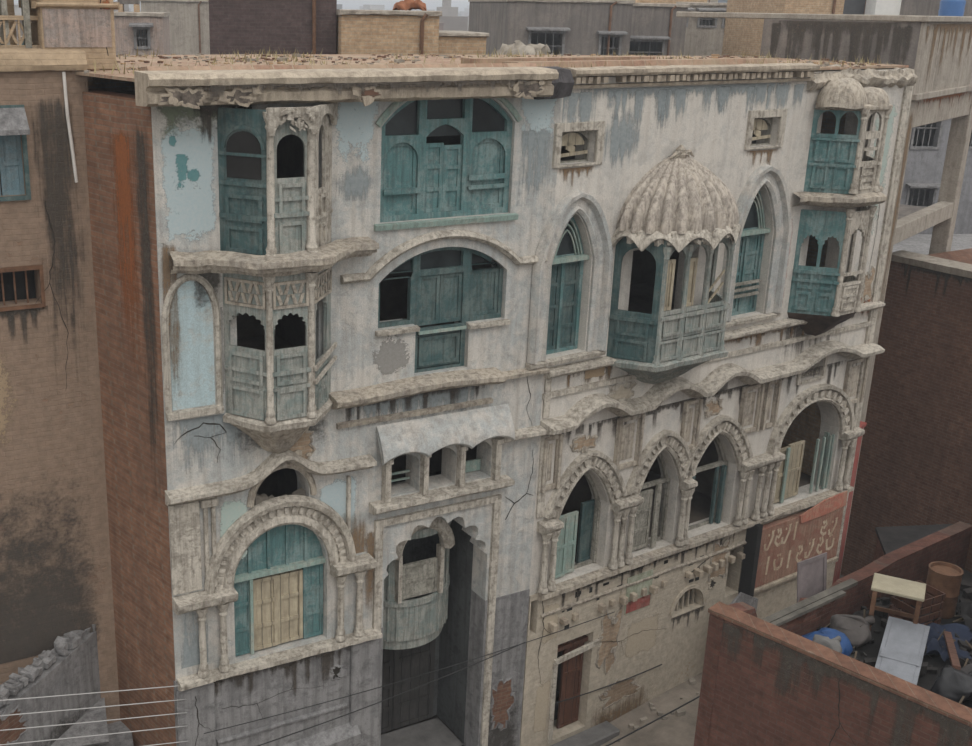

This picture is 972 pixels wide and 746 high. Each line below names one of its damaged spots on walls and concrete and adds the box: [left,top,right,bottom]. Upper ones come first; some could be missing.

spalling [158,85,263,109]
leakage [562,82,804,163]
corrosion [918,92,971,108]
peeling [160,125,216,242]
leakage [33,99,79,327]
leakage [0,308,40,340]
peeling [372,335,410,375]
crack [175,422,226,463]
spalling [289,426,316,460]
crack [505,451,534,520]
spalling [595,605,659,710]
spalling [490,677,516,731]